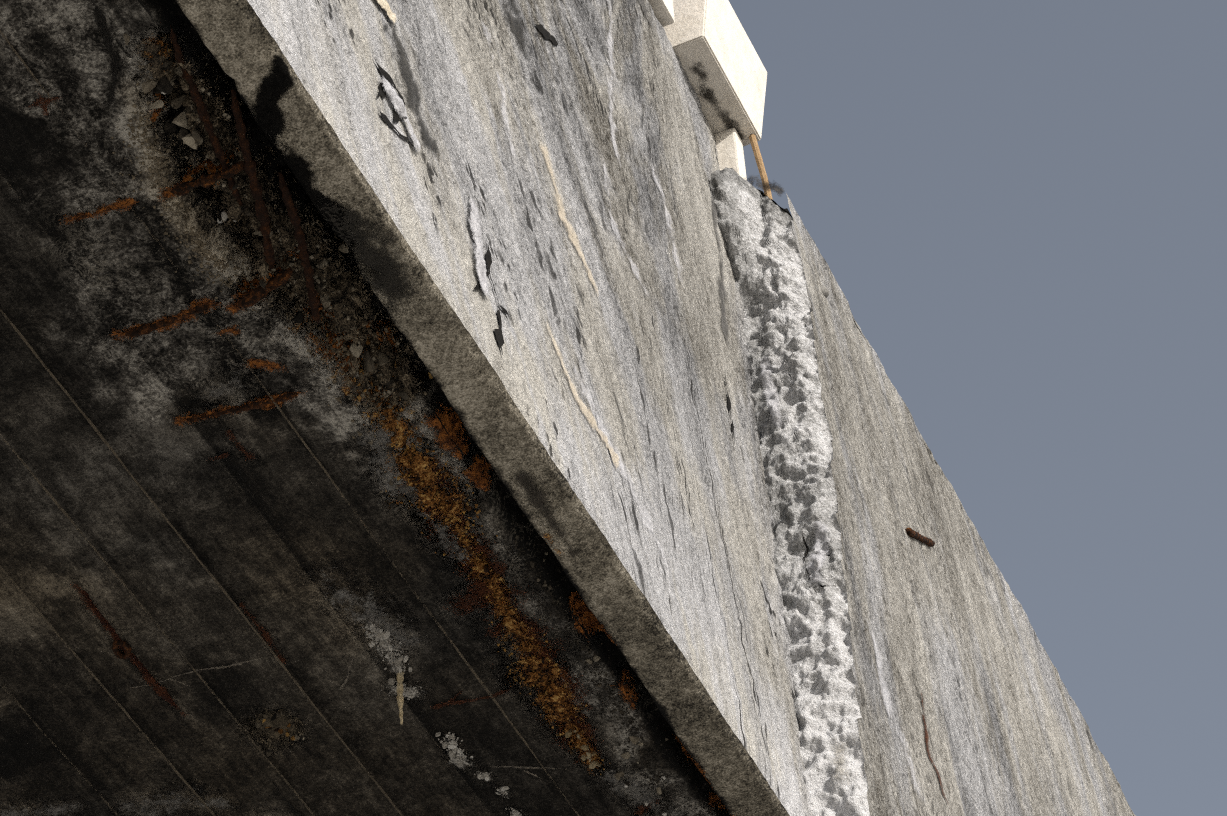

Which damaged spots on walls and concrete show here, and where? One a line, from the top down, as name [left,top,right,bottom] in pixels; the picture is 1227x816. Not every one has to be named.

spalling [110,33,433,505]
water stain [319,203,419,313]
rust [401,406,596,756]
water stain [331,588,422,700]
water stain [435,732,522,816]